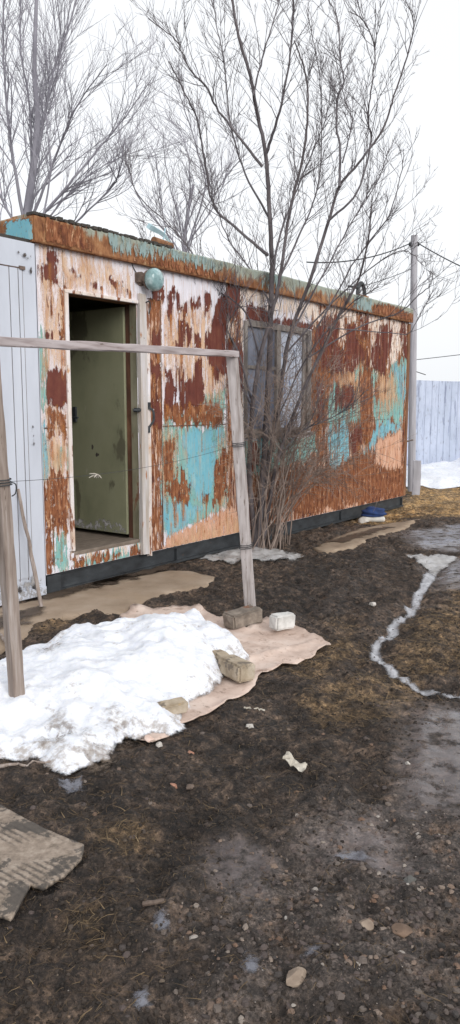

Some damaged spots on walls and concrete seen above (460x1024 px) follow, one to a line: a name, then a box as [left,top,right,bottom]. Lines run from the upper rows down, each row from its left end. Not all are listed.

peeling [3,218,33,240]
peeling [18,247,61,316]
corrosion [40,217,130,367]
peeling [93,275,132,299]
peeling [108,232,227,273]
peeling [32,325,69,482]
corrosion [43,403,126,575]
corrosion [70,297,413,569]
peeling [150,272,408,549]